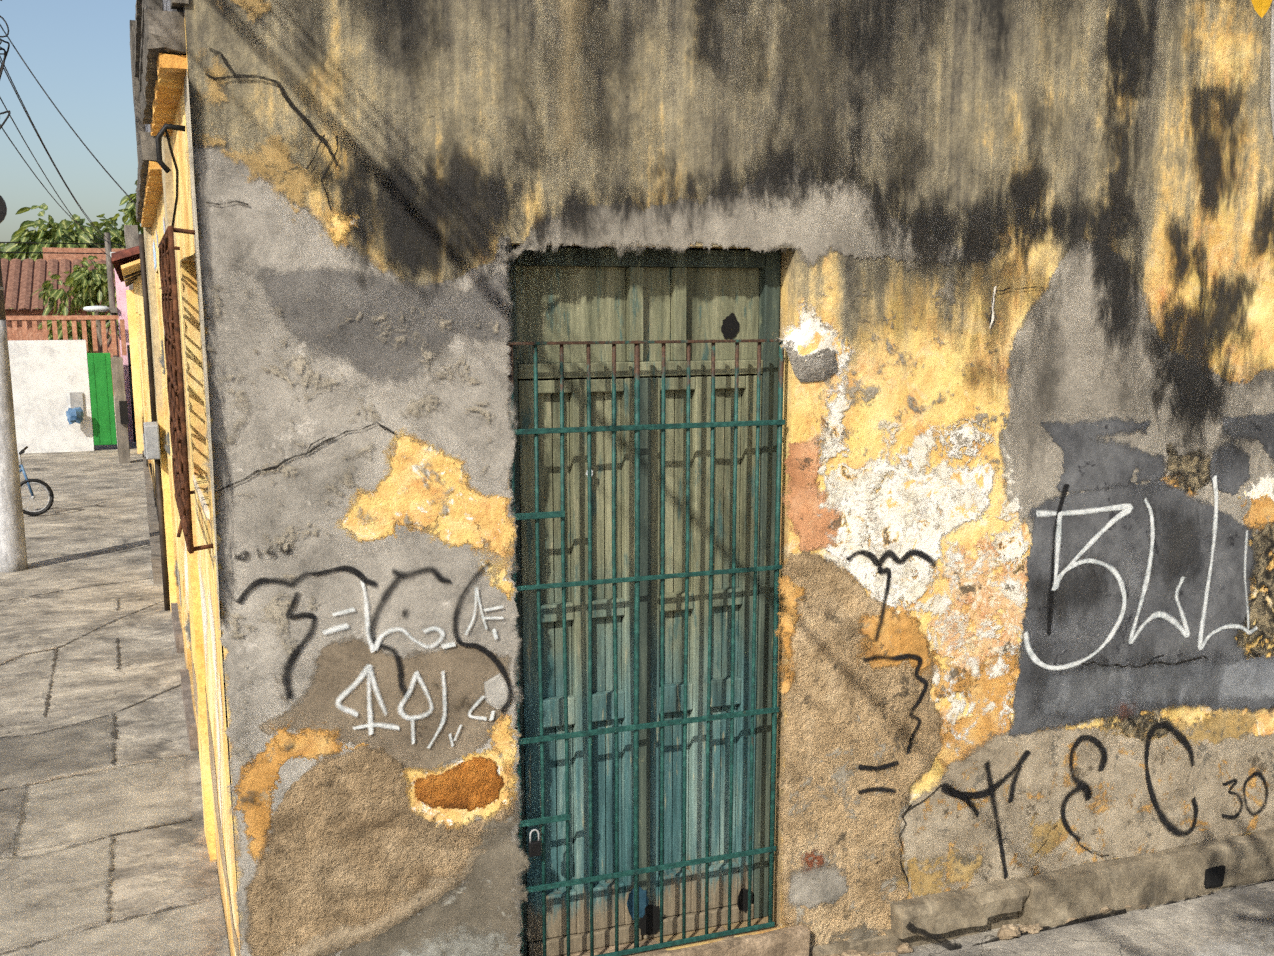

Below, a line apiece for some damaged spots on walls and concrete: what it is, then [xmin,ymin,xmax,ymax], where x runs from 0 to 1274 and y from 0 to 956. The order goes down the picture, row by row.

water stain [197,51,227,103]
crack [205,47,339,211]
water stain [203,134,533,285]
water stain [534,138,829,244]
water stain [693,0,724,74]
water stain [848,0,1154,344]
water stain [1187,83,1247,218]
water stain [1252,190,1274,256]
water stain [1152,221,1257,432]
crack [217,422,395,492]
peeling [174,69,1012,956]
spalling [775,238,1274,947]